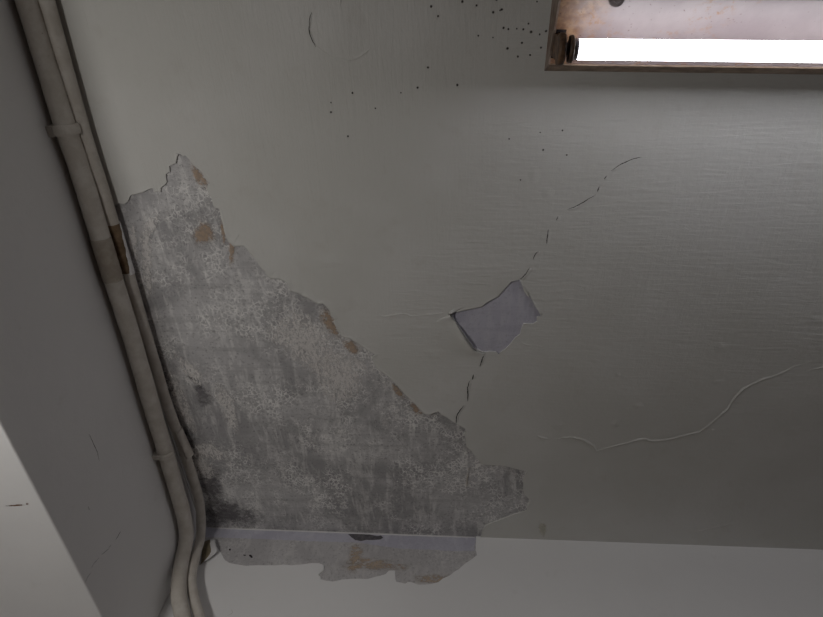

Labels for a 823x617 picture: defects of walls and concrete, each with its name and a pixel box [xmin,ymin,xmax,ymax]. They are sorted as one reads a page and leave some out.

crack [521,157,642,280]
peeling [113,151,544,587]
crack [455,354,486,423]
crack [537,361,823,453]